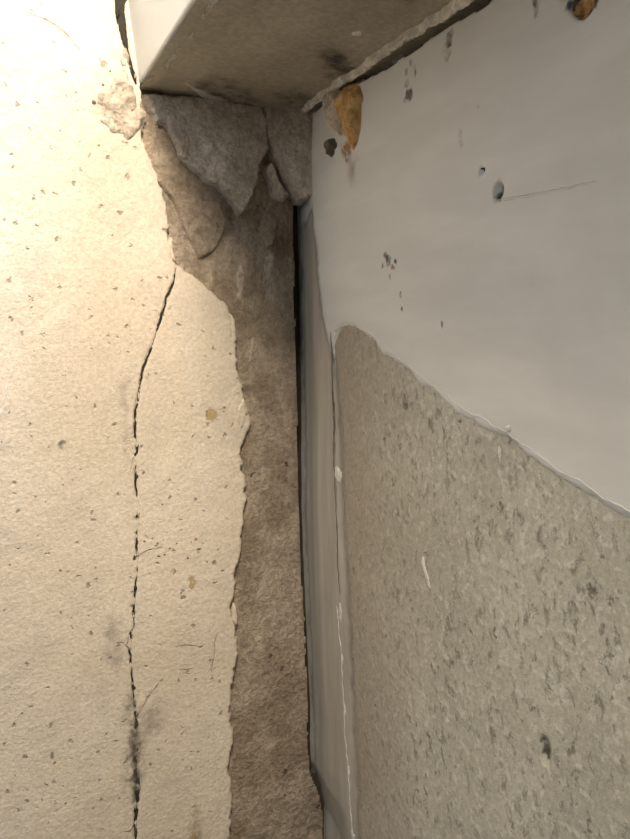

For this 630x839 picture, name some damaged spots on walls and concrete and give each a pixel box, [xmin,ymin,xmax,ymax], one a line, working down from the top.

corrosion [322,79,364,161]
crack [119,269,176,839]
spalling [92,45,323,839]
crack [293,205,324,839]
peeling [302,210,630,839]